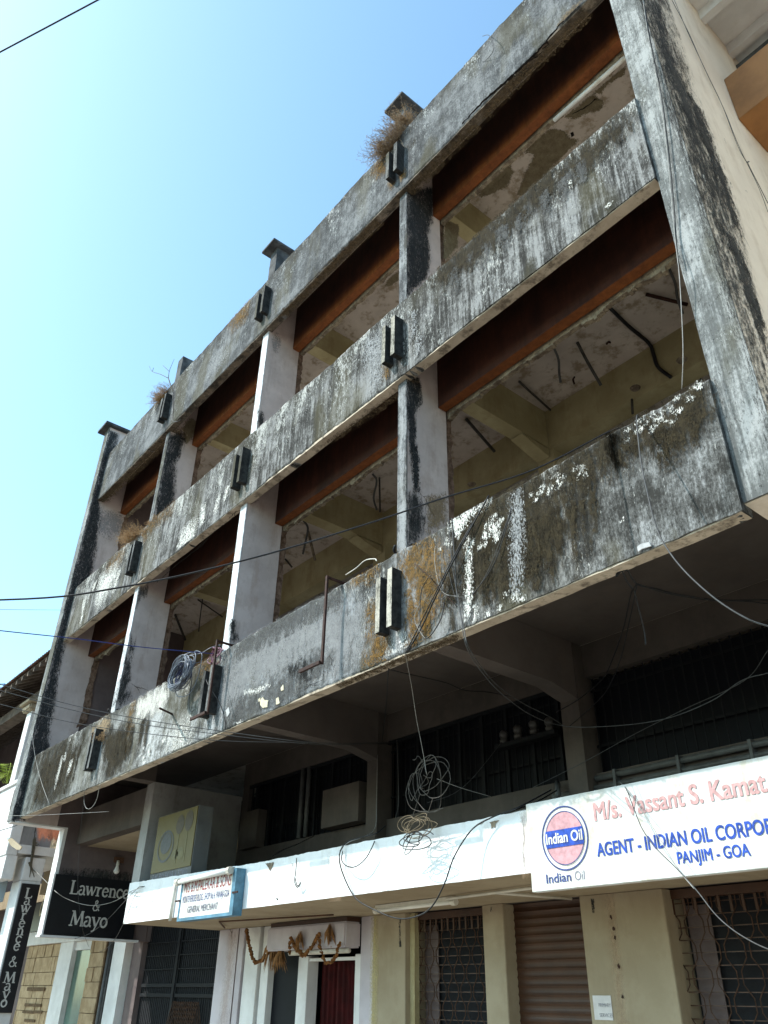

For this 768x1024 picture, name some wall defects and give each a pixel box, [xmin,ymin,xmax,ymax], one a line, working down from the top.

damp [406,109,641,295]
damp [635,0,768,449]
damp [11,430,150,822]
damp [152,430,186,518]
corrosion [347,564,380,588]
damp [361,328,383,392]
corrosion [360,491,451,667]
damp [405,377,426,545]
flaking render [447,252,679,421]
damp [440,374,723,631]
peeling [623,380,704,441]
damp [162,715,193,754]